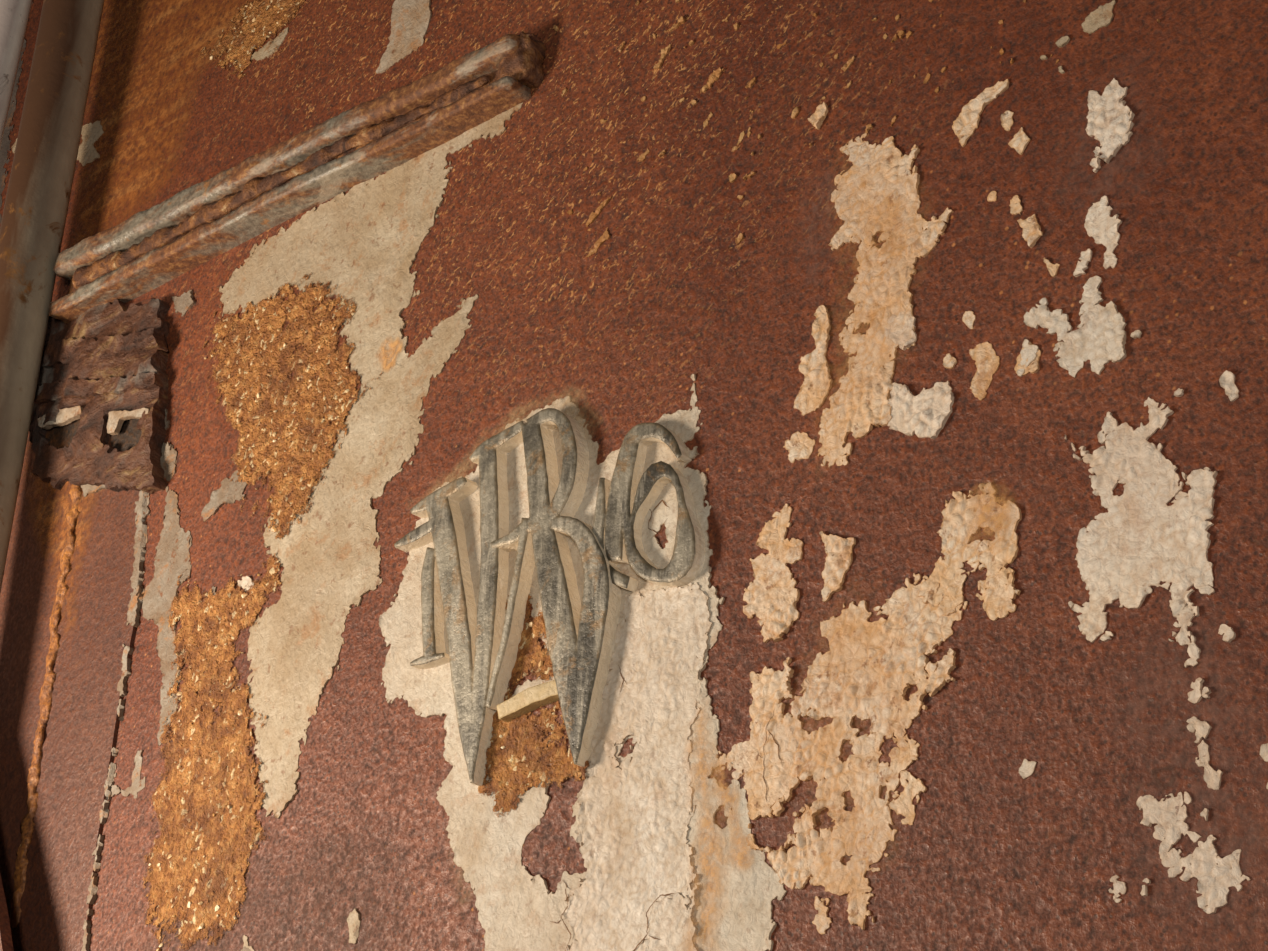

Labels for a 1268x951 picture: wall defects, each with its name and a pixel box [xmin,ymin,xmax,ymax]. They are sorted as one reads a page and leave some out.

rust [77,0,305,241]
rust [72,75,492,289]
peeling [783,115,1000,468]
peeling [1014,196,1142,378]
peeling [1085,78,1135,173]
rust [34,478,92,560]
rust [140,272,401,951]
peeling [219,103,523,819]
rust [478,595,589,817]
peeling [379,374,1021,951]
peeling [1064,388,1223,790]
peeling [1136,792,1250,915]